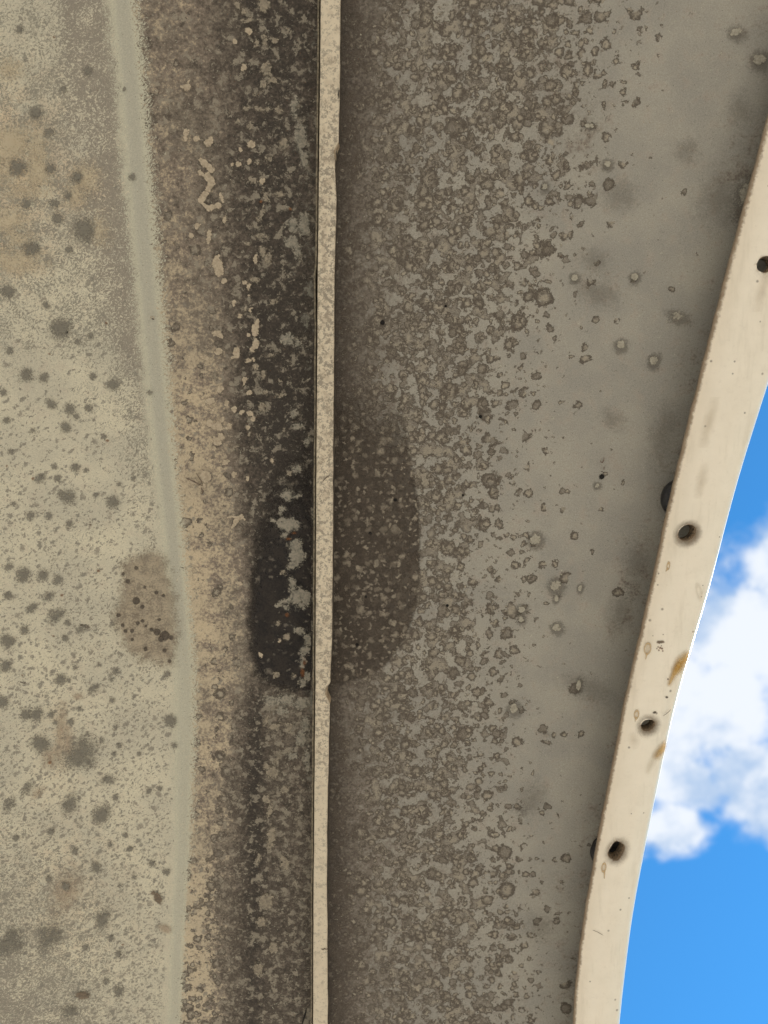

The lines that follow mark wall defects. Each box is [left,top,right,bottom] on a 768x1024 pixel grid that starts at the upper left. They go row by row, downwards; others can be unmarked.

water stain [114,553,177,679]
water stain [247,439,311,693]
water stain [329,400,420,685]
corrosion [669,654,689,684]